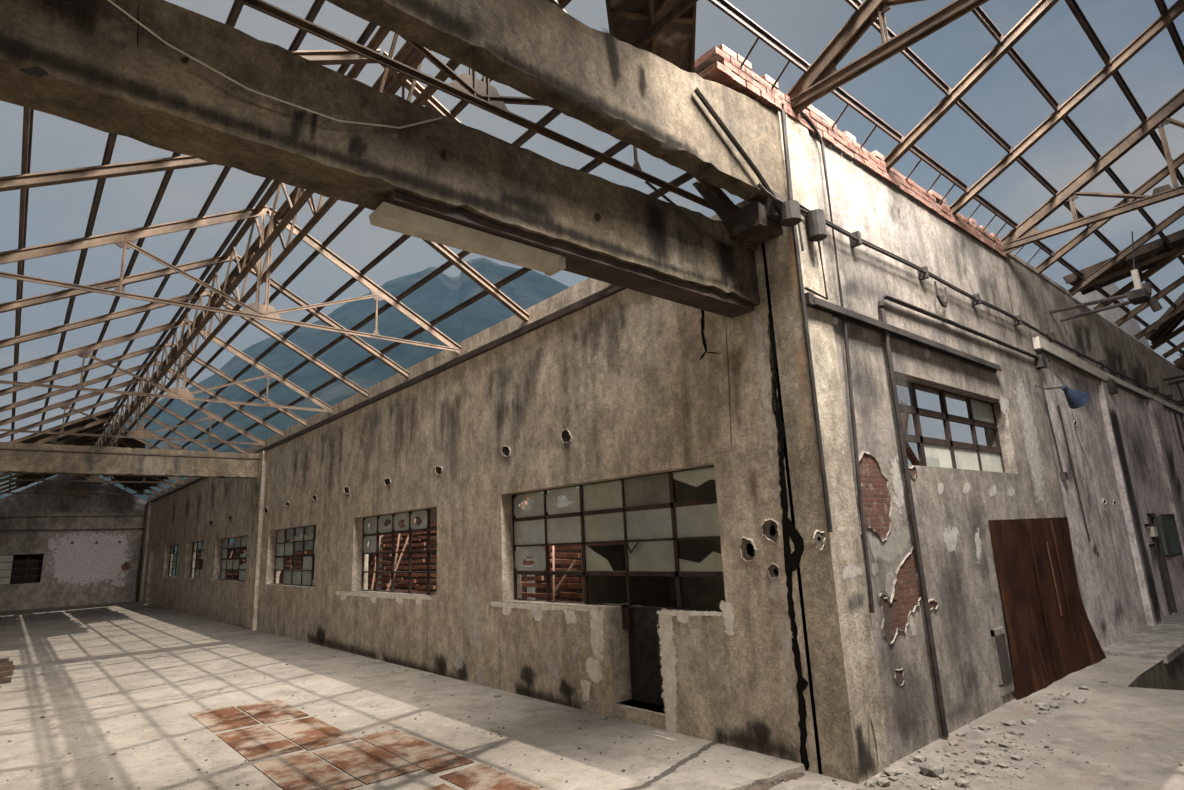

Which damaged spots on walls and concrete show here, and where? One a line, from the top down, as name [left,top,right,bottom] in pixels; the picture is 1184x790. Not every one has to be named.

flaking render [694,44,1009,259]
crack [700,310,732,458]
crack [768,312,810,771]
spalling [857,450,939,646]
leakage [308,627,467,680]
leakage [516,666,579,709]
crack [842,710,879,776]